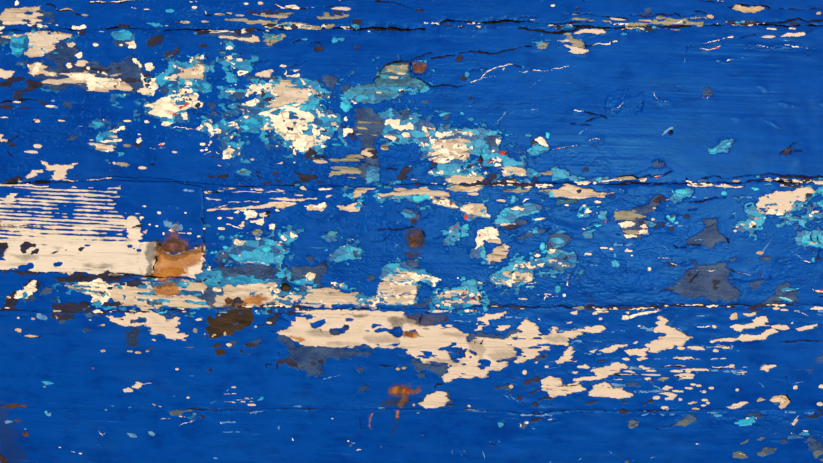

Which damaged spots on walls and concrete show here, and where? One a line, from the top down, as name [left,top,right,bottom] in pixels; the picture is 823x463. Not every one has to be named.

crack [46,4,90,17]
crack [625,8,714,63]
peeling [701,0,769,13]
peeling [739,29,813,51]
crack [763,18,823,30]
peeling [0,0,747,407]
peeling [729,178,823,263]
rust [152,222,204,296]
rust [224,295,267,307]
peeling [773,287,823,316]
peeling [710,312,818,359]
rust [389,386,420,407]